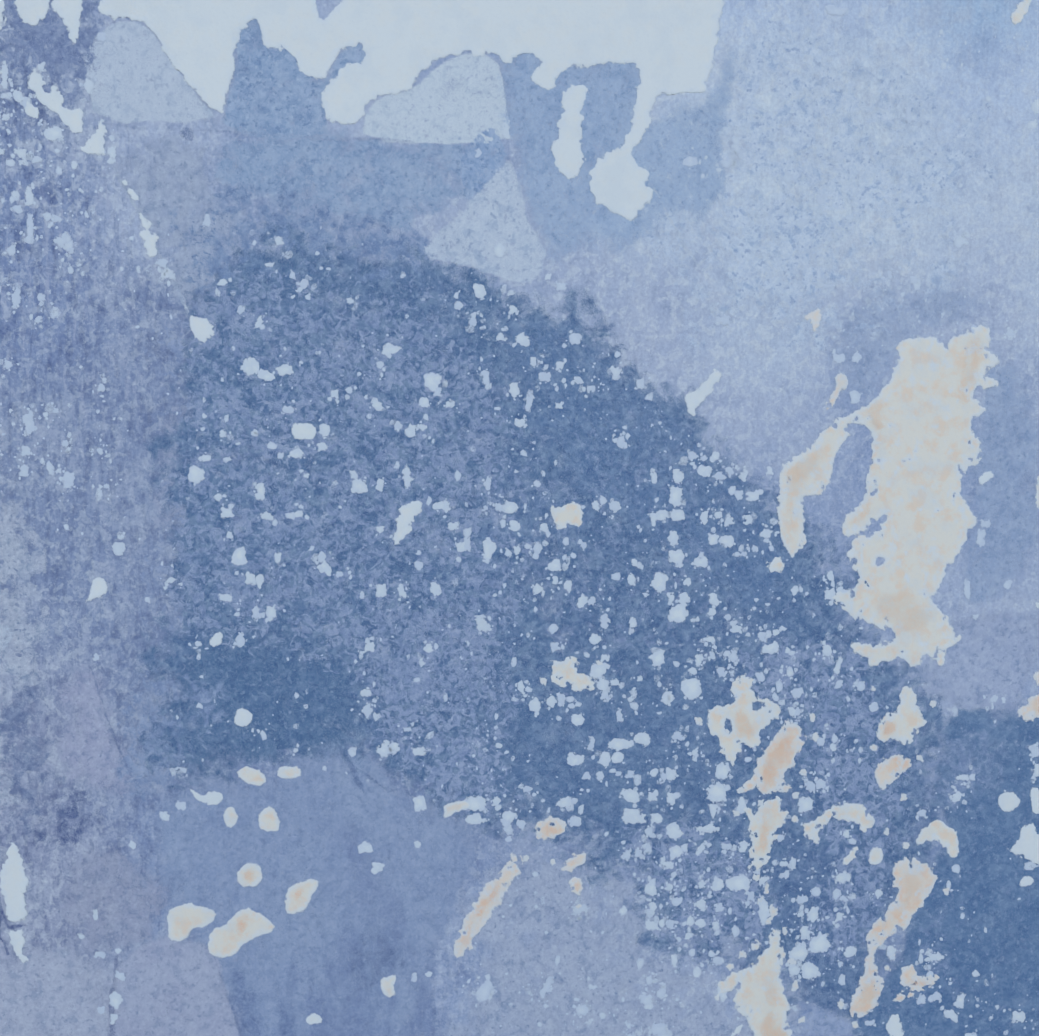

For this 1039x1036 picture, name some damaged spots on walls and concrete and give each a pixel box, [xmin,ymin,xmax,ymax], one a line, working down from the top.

peeling [98,0,727,222]
peeling [185,304,215,352]
peeling [237,347,386,526]
peeling [327,332,460,443]
peeling [188,485,286,660]
peeling [227,701,278,752]
peeling [237,742,323,786]
peeling [349,624,397,722]
peeling [375,255,1039,1036]
peeling [0,842,29,963]
peeling [166,903,275,958]
peeling [284,878,319,914]